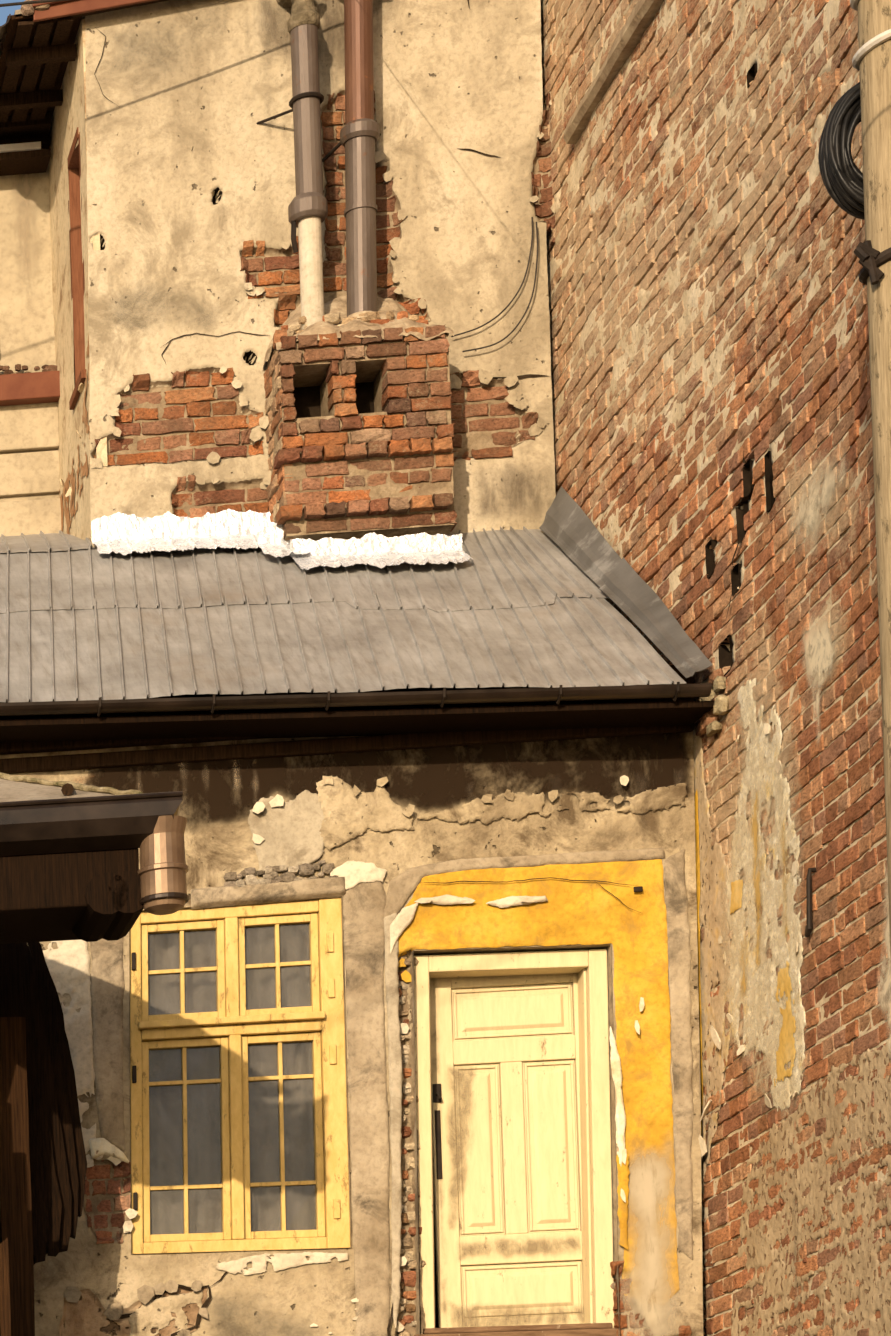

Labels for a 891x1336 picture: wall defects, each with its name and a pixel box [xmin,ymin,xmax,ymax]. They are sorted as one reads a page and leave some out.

flaking render [239,236,301,327]
flaking render [321,90,347,303]
flaking render [375,142,431,322]
flaking render [59,334,271,535]
flaking render [450,368,546,461]
flaking render [43,940,138,1244]
flaking render [248,678,891,1336]
flaking render [59,1280,208,1336]
peeling [216,1252,348,1275]